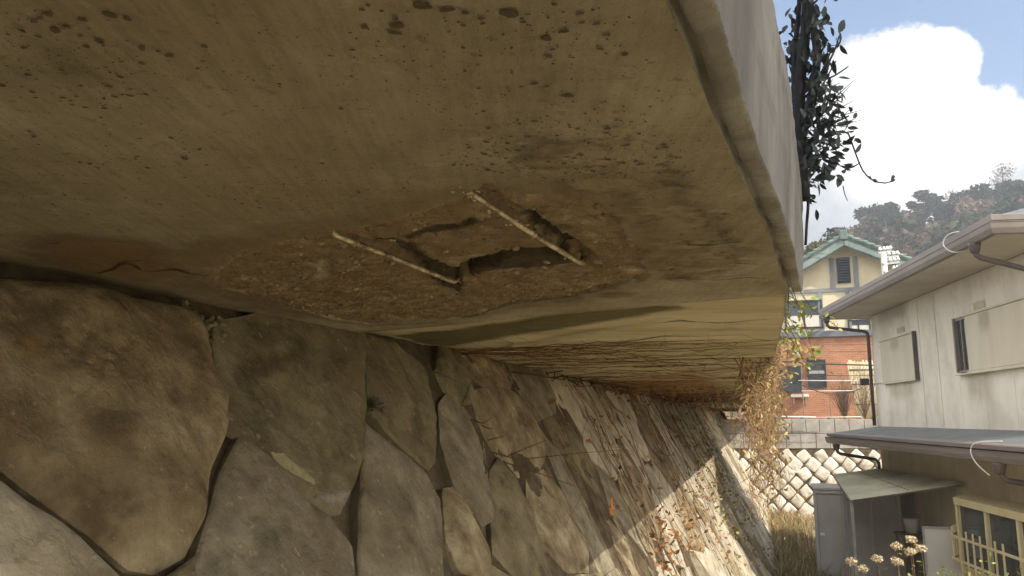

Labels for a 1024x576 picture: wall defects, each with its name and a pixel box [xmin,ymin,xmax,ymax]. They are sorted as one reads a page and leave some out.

crack [98,260,213,277]
spalling [199,183,651,323]